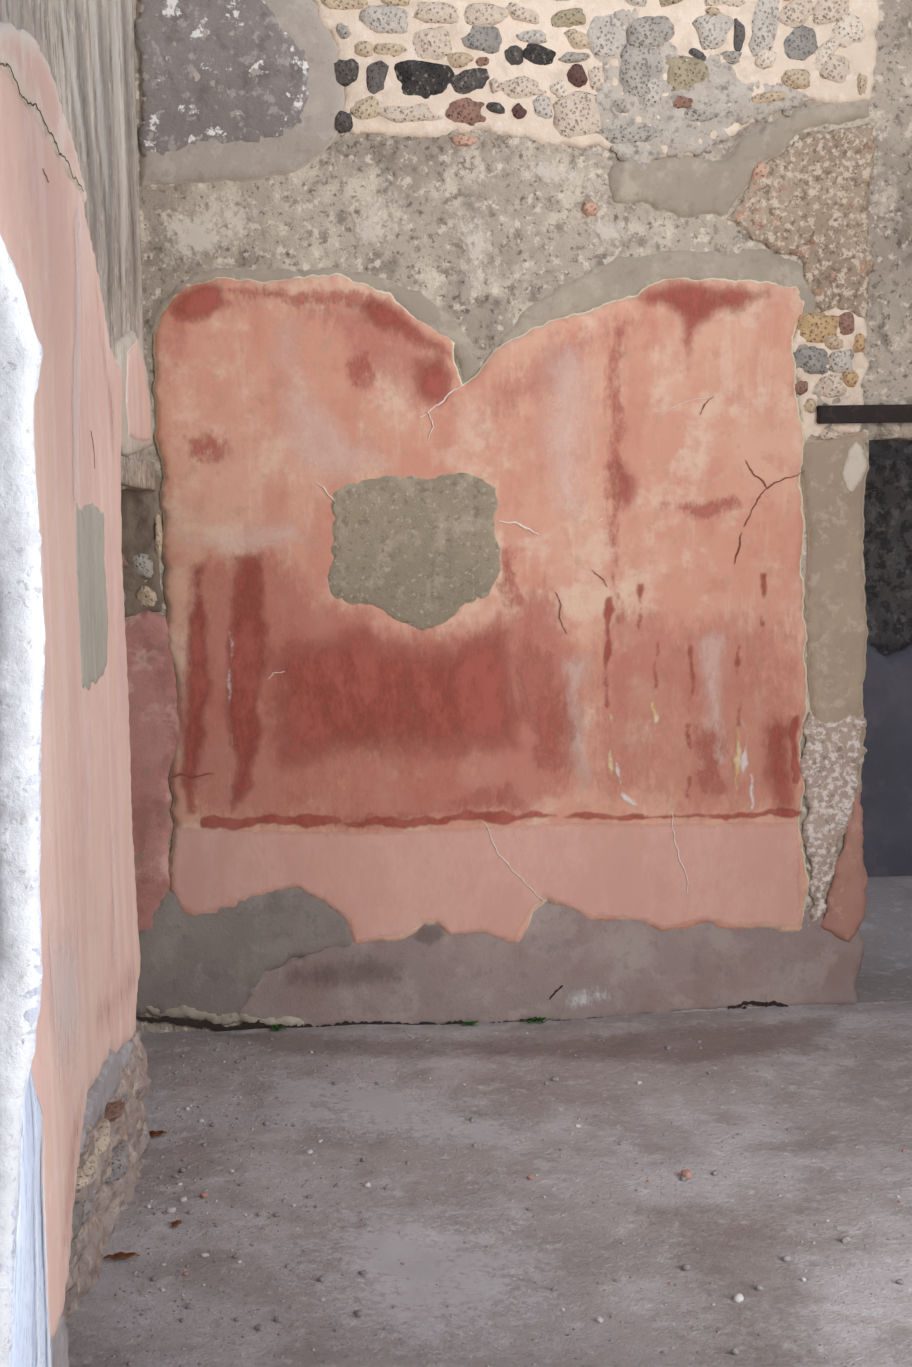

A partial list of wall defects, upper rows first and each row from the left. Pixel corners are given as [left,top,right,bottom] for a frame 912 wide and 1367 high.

flaking render [313,0,880,158]
flaking render [581,200,599,217]
flaking render [793,308,869,493]
crack [735,461,805,562]
peeling [50,711,867,1367]